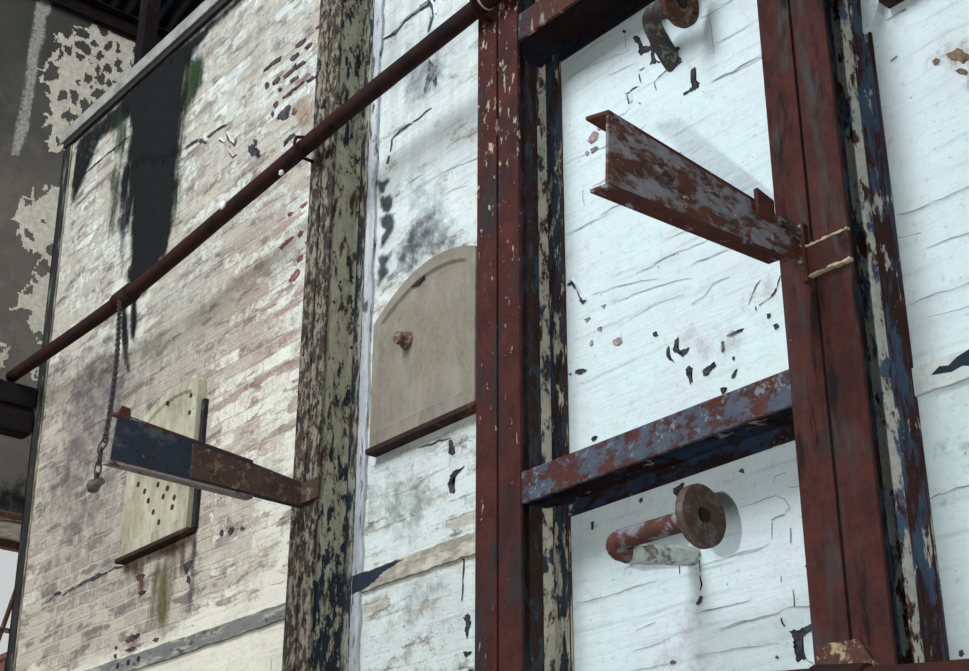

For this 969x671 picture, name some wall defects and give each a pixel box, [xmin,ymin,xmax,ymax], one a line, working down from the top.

crack [383,0,437,40]
peeling [11,0,135,156]
spalling [263,38,316,121]
corrosion [932,48,969,75]
leakage [109,44,203,283]
peeling [9,184,60,344]
flaking render [279,230,307,283]
leakage [398,215,454,271]
peeling [0,342,11,370]
spalling [447,466,464,494]
spalling [790,617,812,662]